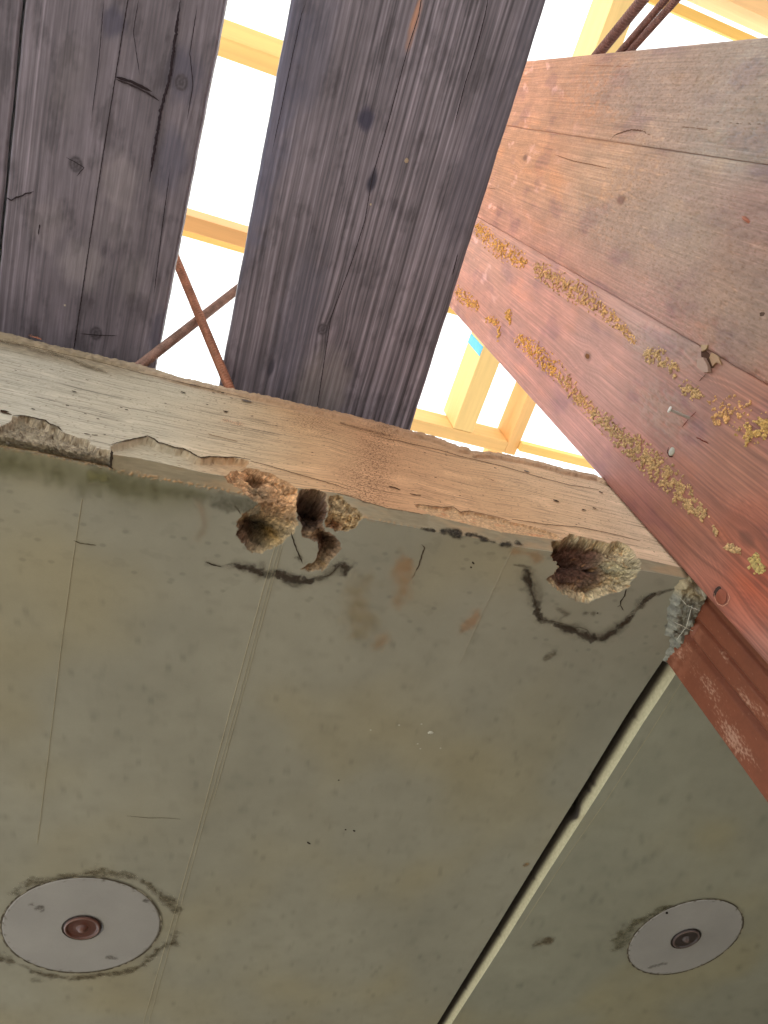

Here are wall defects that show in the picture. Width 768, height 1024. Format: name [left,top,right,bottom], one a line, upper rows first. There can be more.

spalling [0,408,364,572]
water stain [234,564,350,584]
water stain [518,565,633,644]